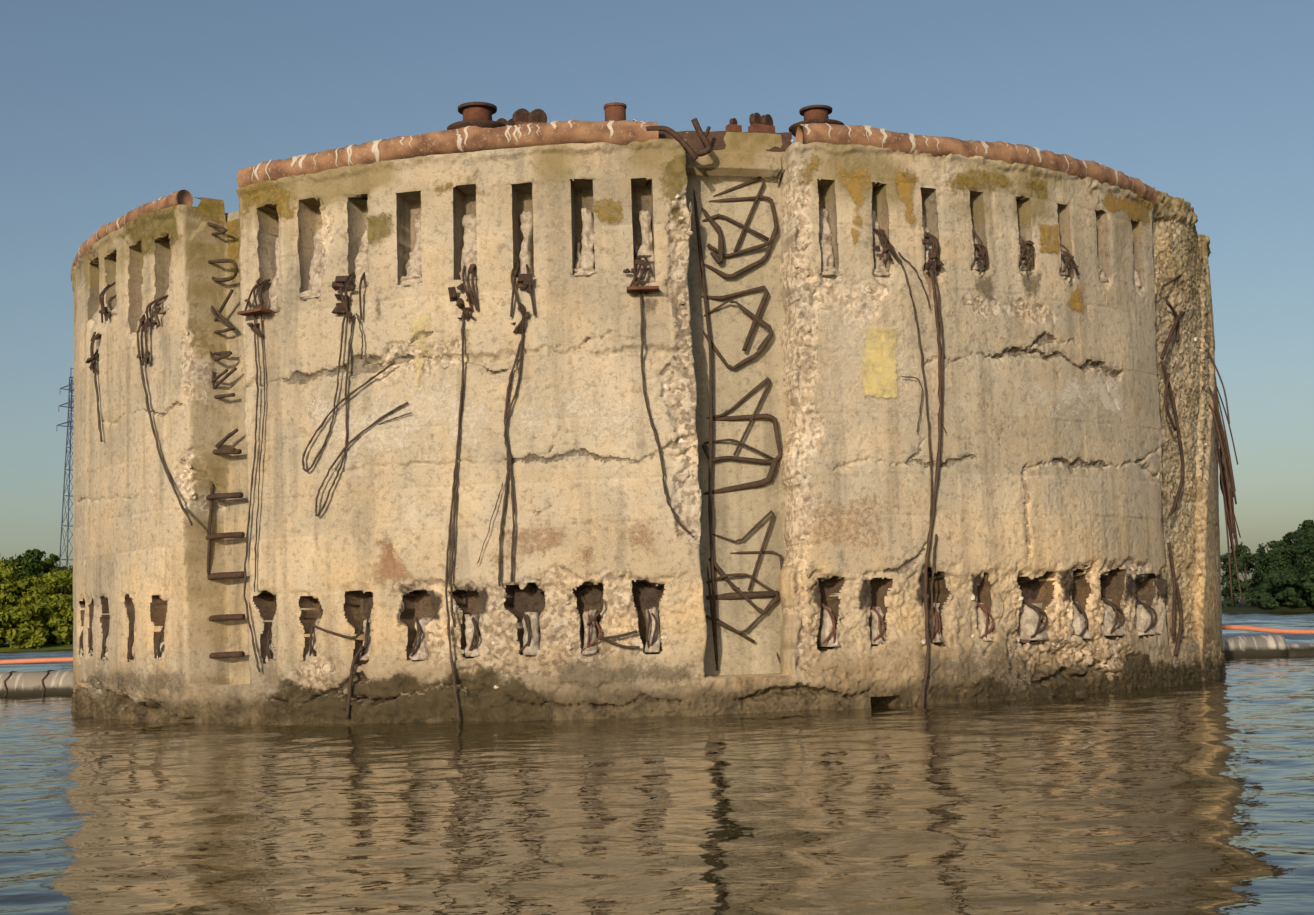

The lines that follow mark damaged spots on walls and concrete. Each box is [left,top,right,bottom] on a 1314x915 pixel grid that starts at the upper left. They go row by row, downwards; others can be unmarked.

crack [282,330,434,385]
spalling [656,192,702,544]
crack [982,331,1124,394]
spalling [779,161,890,671]
crack [505,435,686,464]
crack [905,448,976,468]
spalling [962,214,1214,689]
spalling [390,564,668,698]
damp [95,671,185,696]
spalling [284,617,369,719]
damp [559,661,693,690]
damp [922,643,1048,693]